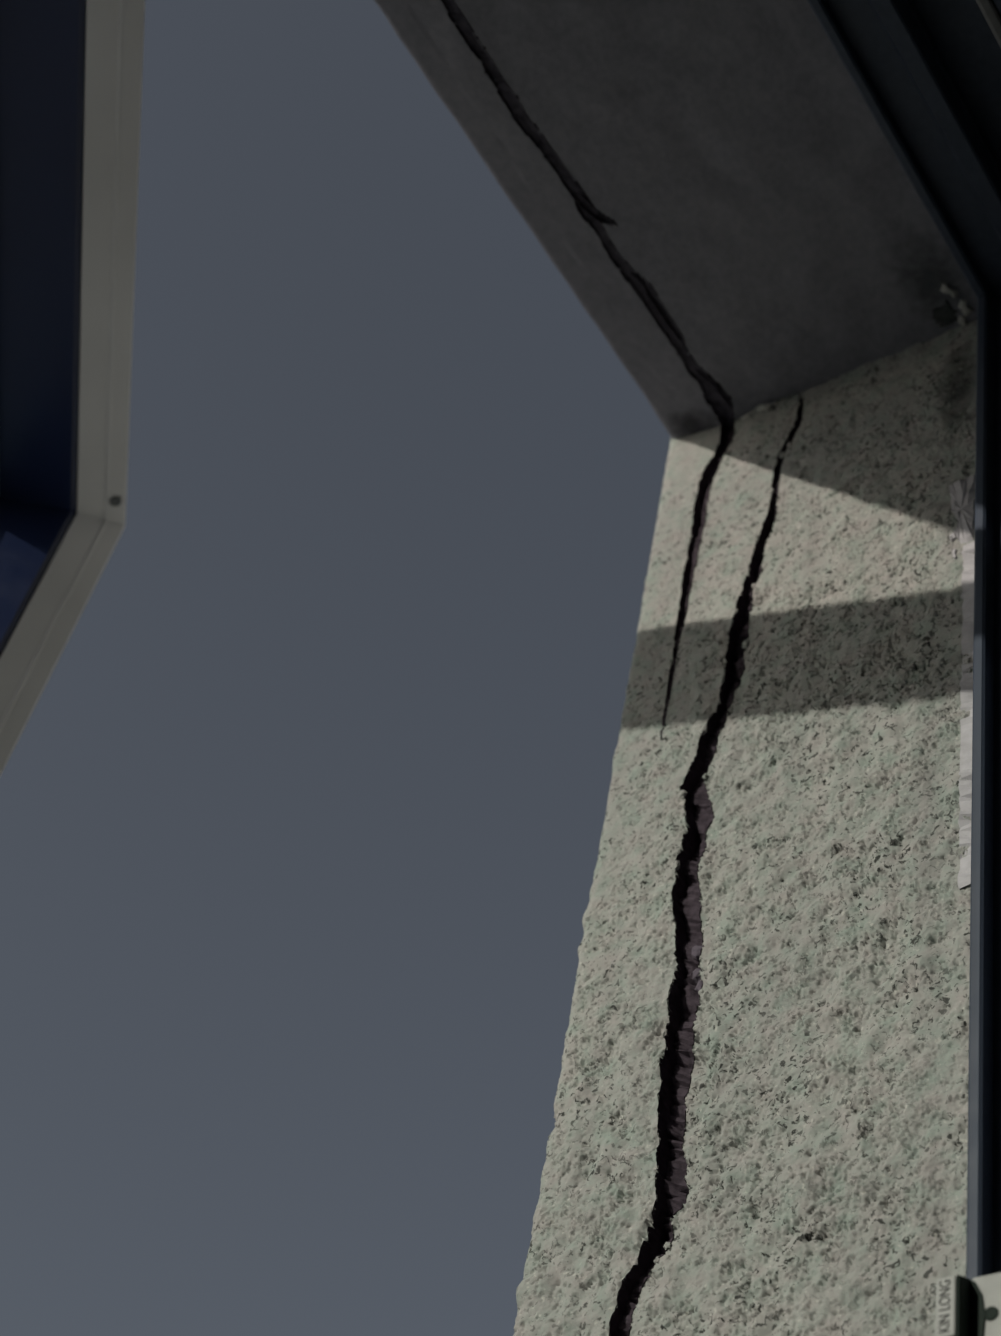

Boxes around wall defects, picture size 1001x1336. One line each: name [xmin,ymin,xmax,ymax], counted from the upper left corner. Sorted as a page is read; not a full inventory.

crack [440,0,735,740]
crack [609,393,804,1336]